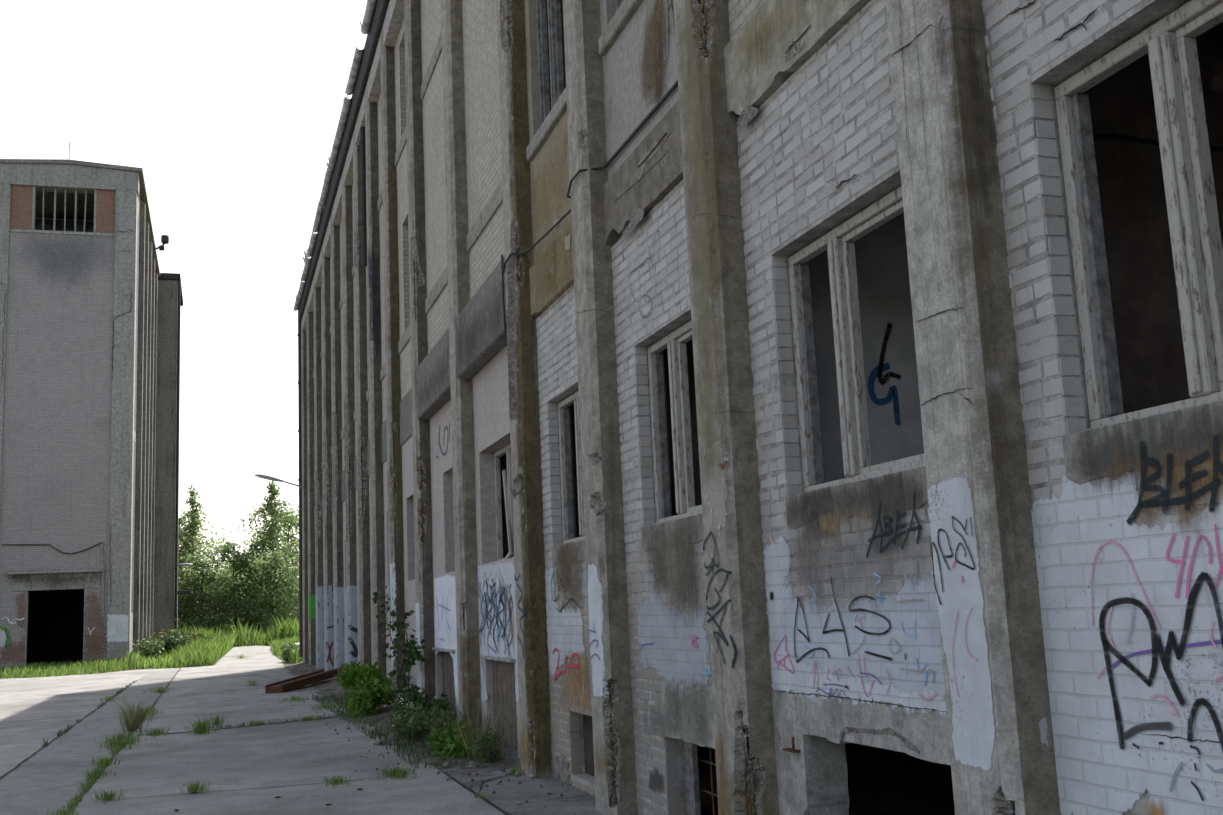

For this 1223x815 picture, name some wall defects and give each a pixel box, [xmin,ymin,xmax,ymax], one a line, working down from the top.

damp [642,0,669,102]
crack [891,2,978,151]
crack [1008,0,1035,15]
crack [1053,9,1097,42]
crack [111,287,132,378]
spalling [602,679,622,808]
spalling [733,711,766,815]
spalling [994,785,1015,815]